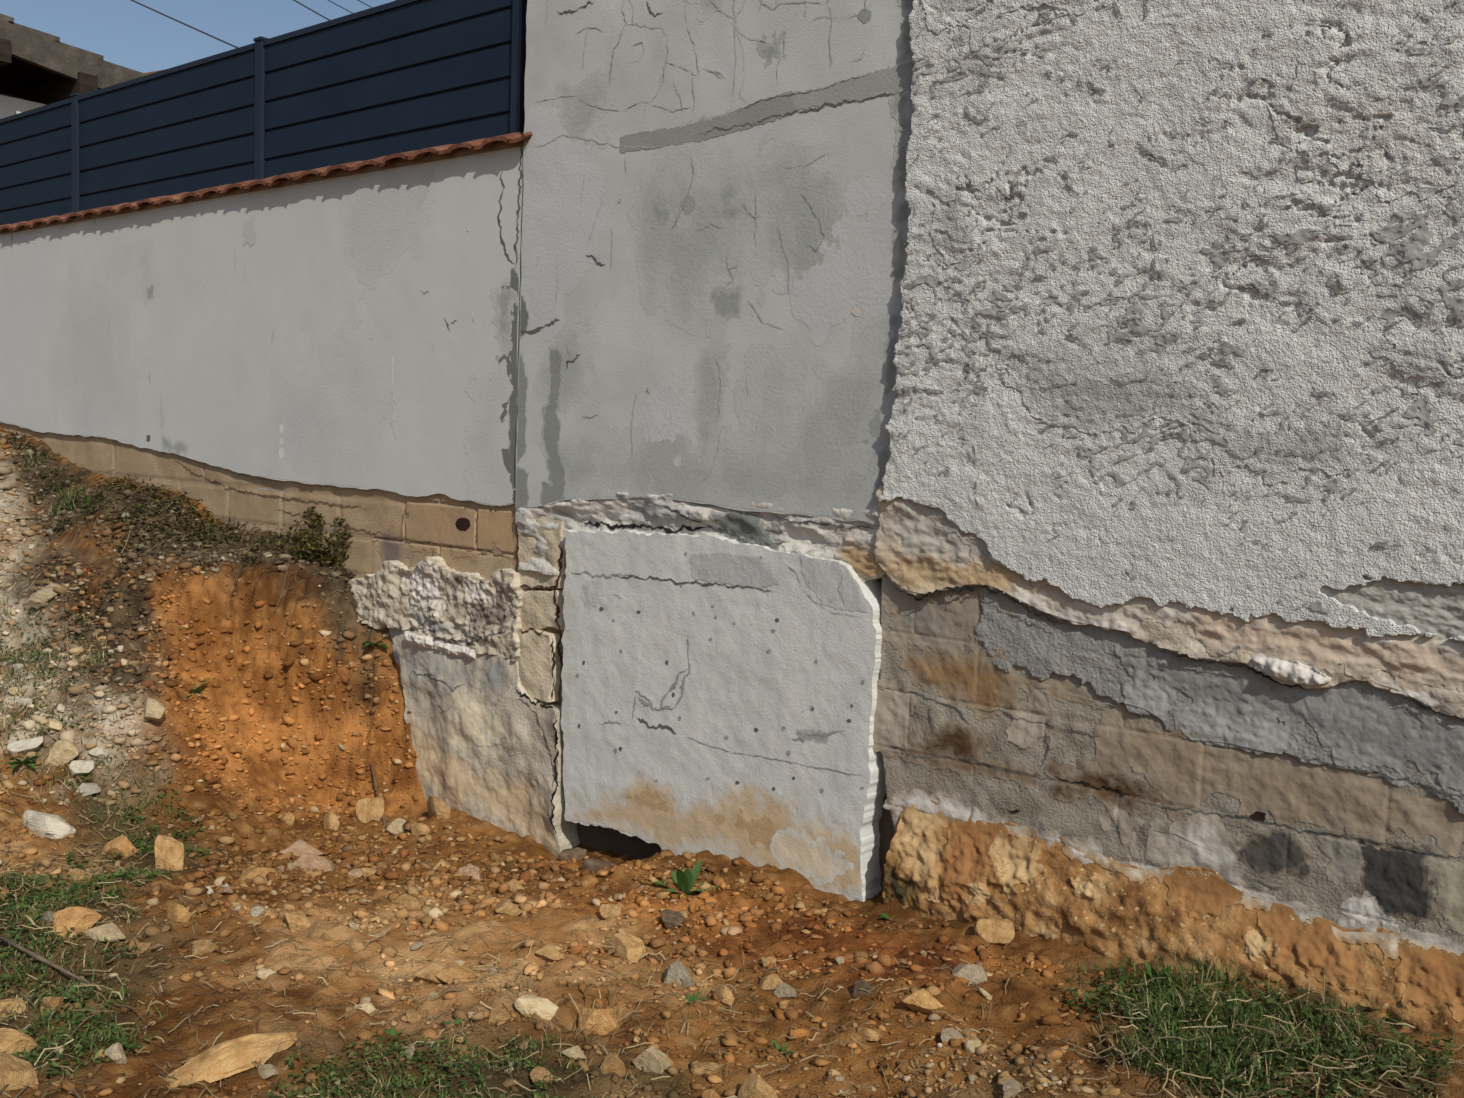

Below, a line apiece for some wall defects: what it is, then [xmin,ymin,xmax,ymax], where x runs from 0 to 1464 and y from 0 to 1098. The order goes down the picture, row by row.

crack [497,0,900,369]
damp [377,63,915,707]
spalling [882,498,1009,570]
crack [175,359,875,842]
spalling [1321,576,1464,644]
spalling [861,679,917,757]
spalling [993,689,1056,749]
crack [603,639,1464,858]
spalling [890,800,950,899]
spalling [965,830,1046,906]
damp [881,719,1464,959]
spalling [1243,929,1280,962]